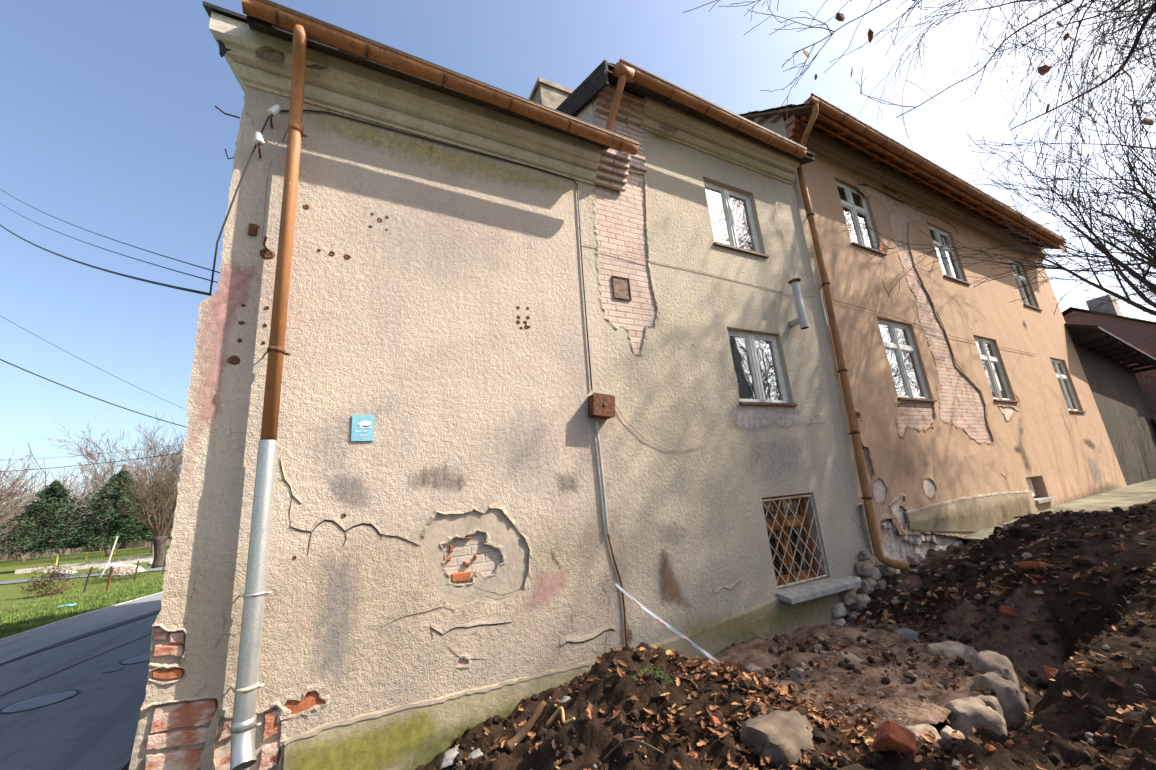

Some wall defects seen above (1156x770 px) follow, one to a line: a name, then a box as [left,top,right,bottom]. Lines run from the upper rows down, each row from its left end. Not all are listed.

spalling [591,169,660,357]
spalling [854,181,1016,446]
crack [917,275,1020,442]
spalling [148,623,190,687]
crack [279,457,419,580]
crack [385,579,521,660]
flaking render [420,503,533,606]
damp [660,552,683,602]
spalling [129,695,233,770]
spalling [245,682,331,770]